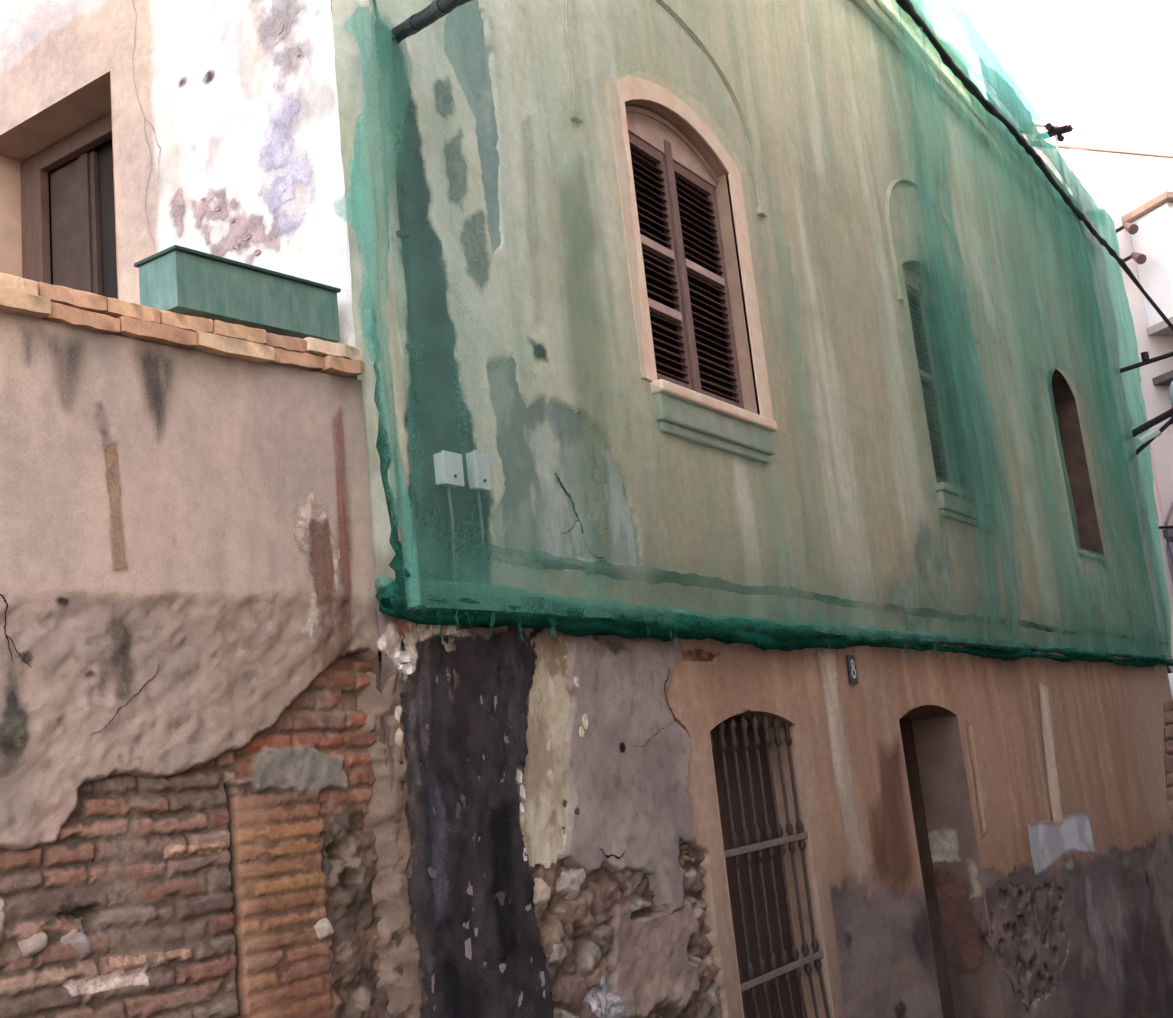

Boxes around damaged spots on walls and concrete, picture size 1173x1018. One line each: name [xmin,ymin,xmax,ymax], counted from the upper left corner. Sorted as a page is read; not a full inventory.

peeling [170,0,313,264]
peeling [486,357,640,569]
crack [0,594,32,667]
spalling [0,492,468,1018]
leakage [401,645,447,1018]
leakage [491,807,517,957]
spalling [517,630,723,1018]
crack [631,667,691,747]
spalling [934,869,1069,1011]
leakage [1086,883,1173,1018]
spalling [1163,700,1173,820]